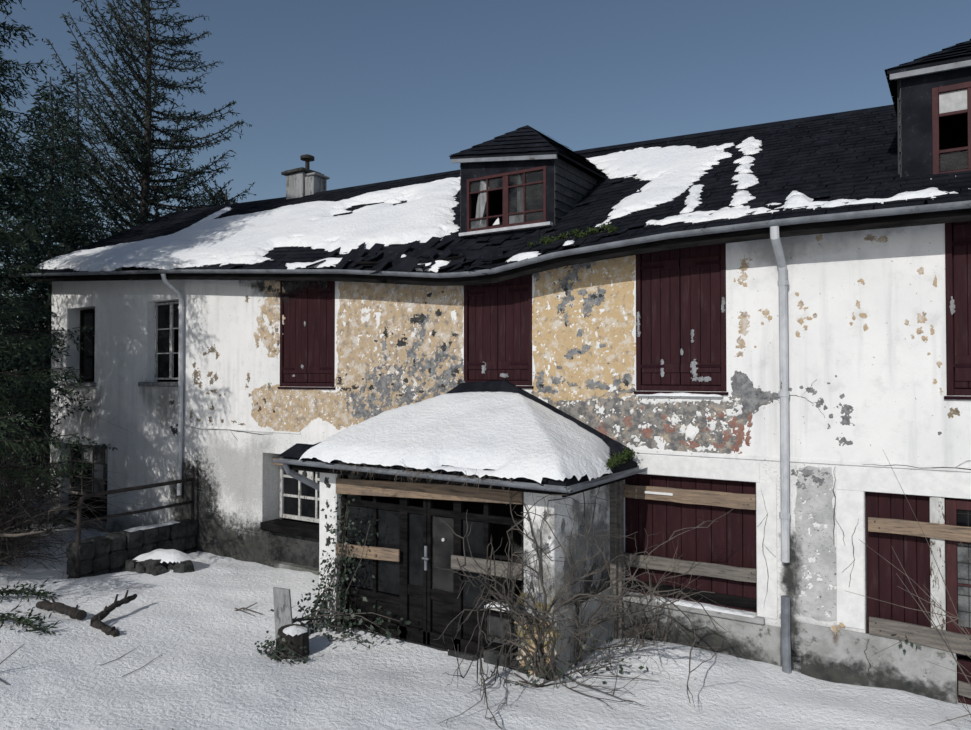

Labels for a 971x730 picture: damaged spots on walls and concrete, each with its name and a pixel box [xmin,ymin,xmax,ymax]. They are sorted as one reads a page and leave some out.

flaking render [190,281,465,434]
flaking render [531,255,780,454]
leakage [168,460,278,567]